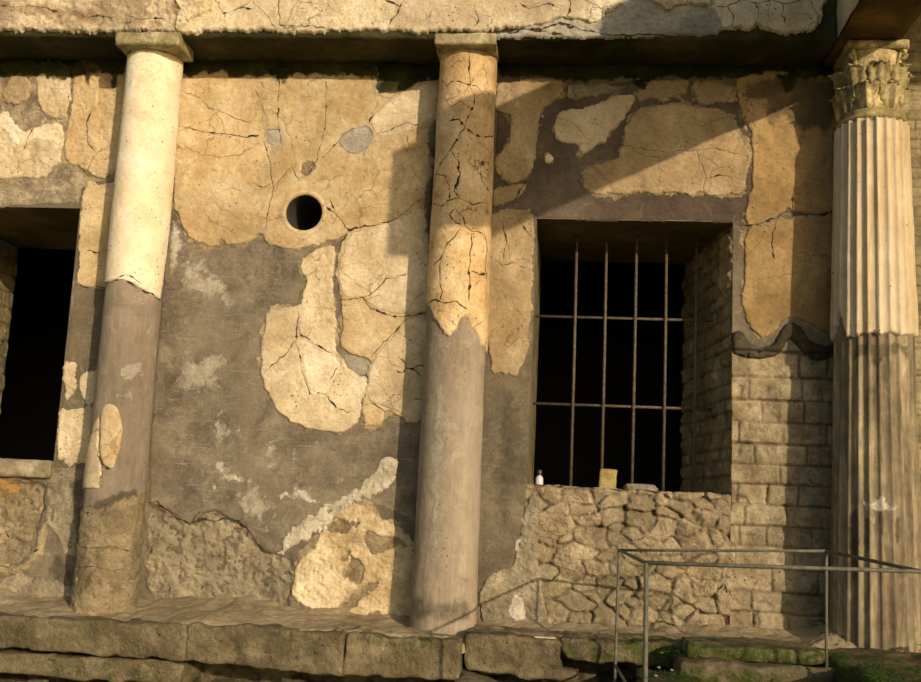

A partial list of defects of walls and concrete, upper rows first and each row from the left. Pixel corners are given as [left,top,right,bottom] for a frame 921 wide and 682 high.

crack [278,0,324,30]
crack [508,0,674,40]
crack [716,0,811,26]
crack [181,81,338,229]
crack [326,56,531,400]
peeling [172,49,919,432]
crack [744,186,833,258]
spalling [0,49,421,616]
crack [267,317,384,413]
crack [149,501,248,528]
spalling [478,492,547,624]